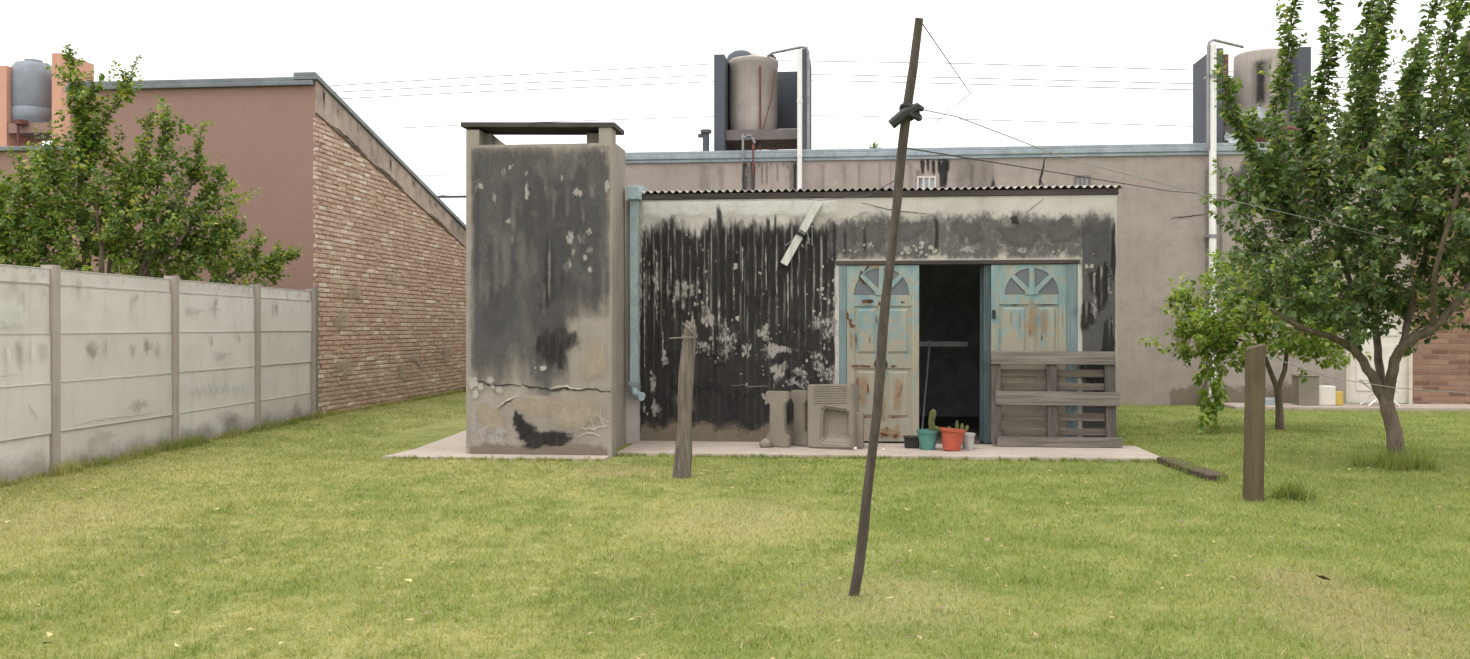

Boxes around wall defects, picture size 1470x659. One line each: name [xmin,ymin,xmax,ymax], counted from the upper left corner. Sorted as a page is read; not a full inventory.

peeling [643,200,830,217]
water stain [742,163,755,191]
water stain [920,159,949,188]
water stain [458,150,609,390]
flaking render [563,229,592,273]
flaking render [653,234,874,404]
corrosion [846,265,881,345]
water stain [640,208,1116,442]
water stain [470,411,607,456]
crack [478,343,610,438]
corrosion [852,365,902,438]
water stain [1170,382,1245,405]